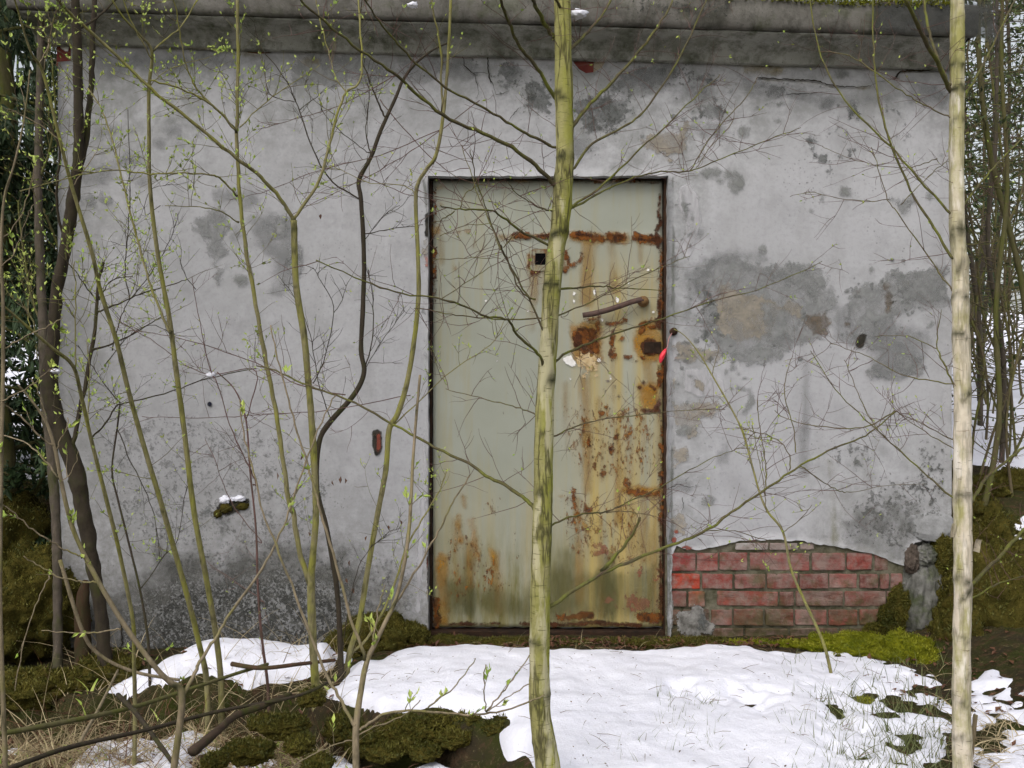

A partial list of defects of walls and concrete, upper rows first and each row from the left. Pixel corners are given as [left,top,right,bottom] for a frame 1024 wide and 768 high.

crack [758,69,938,94]
rust [511,232,550,240]
rust [550,179,664,628]
peeling [672,254,950,468]
water stain [107,539,376,649]
rust [431,525,510,629]
flaking render [665,513,954,637]